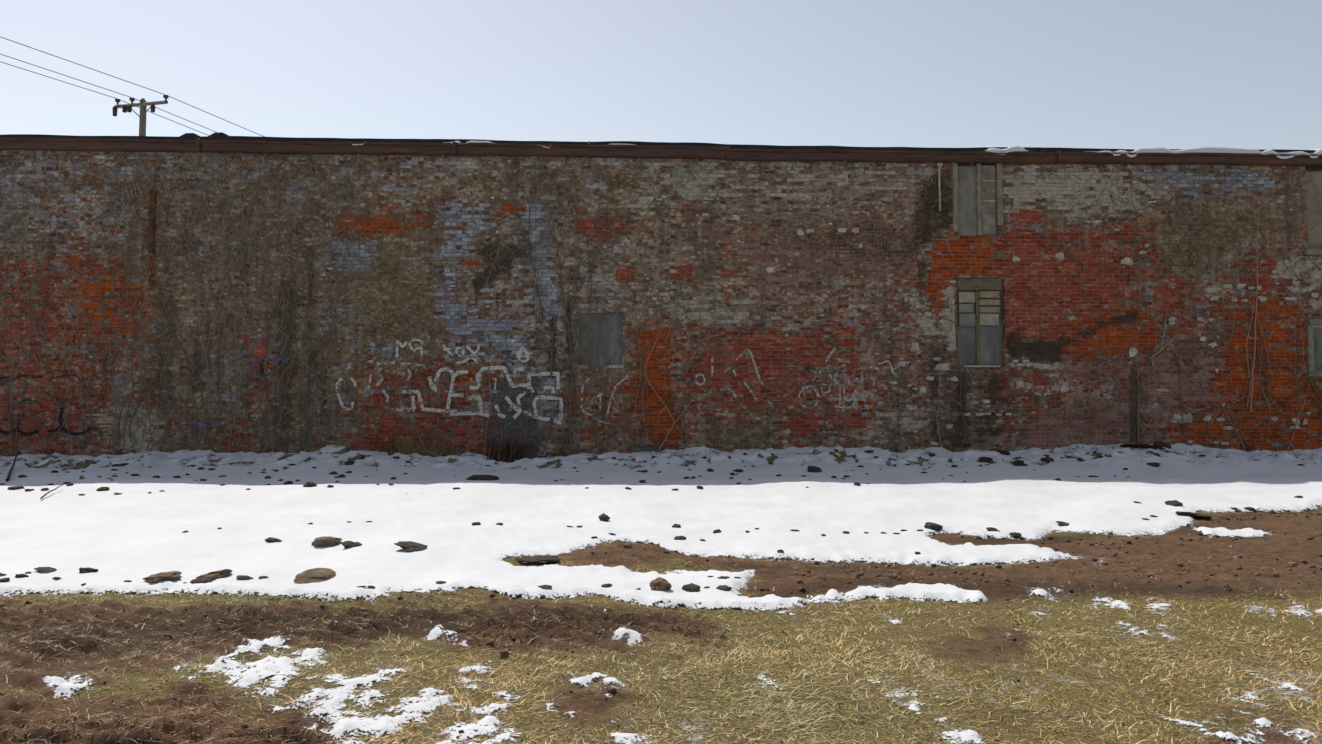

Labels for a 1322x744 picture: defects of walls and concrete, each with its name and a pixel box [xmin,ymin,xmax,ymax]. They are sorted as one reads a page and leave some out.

spalling [0,244,170,457]
peeling [322,162,937,455]